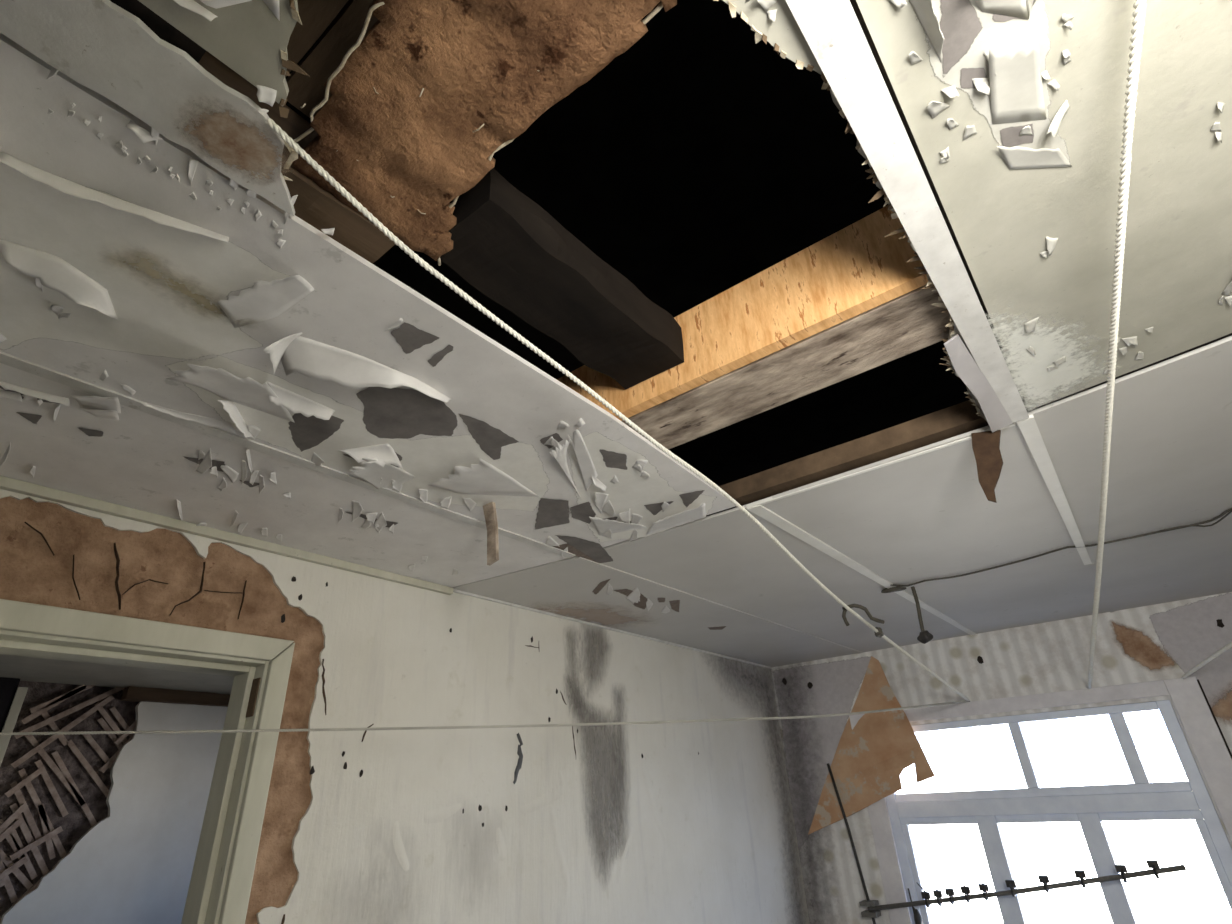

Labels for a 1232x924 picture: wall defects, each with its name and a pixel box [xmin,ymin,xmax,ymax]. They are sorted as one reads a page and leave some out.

peeling [174,0,280,21]
peeling [746,0,777,22]
peeling [254,85,277,113]
peeling [890,0,1074,169]
peeling [115,121,298,249]
peeling [0,147,717,563]
peeling [988,315,1109,410]
crack [24,522,80,600]
crack [114,543,247,619]
spalling [0,496,324,924]
water stain [572,630,624,866]
water stain [720,657,823,924]